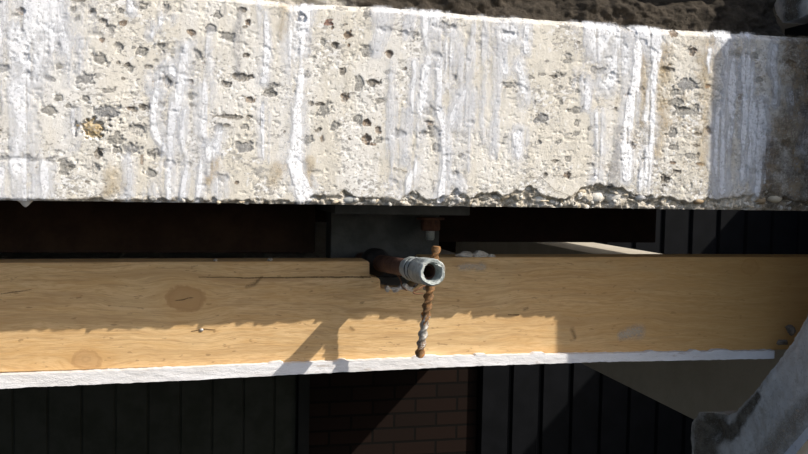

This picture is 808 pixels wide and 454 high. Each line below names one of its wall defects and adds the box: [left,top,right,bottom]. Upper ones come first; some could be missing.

damp [0,0,83,207]
damp [121,153,133,202]
damp [145,36,229,203]
damp [256,0,272,87]
damp [282,3,317,204]
damp [370,6,394,58]
spalling [30,161,808,211]
damp [386,10,533,206]
damp [577,22,663,191]
damp [704,31,808,203]